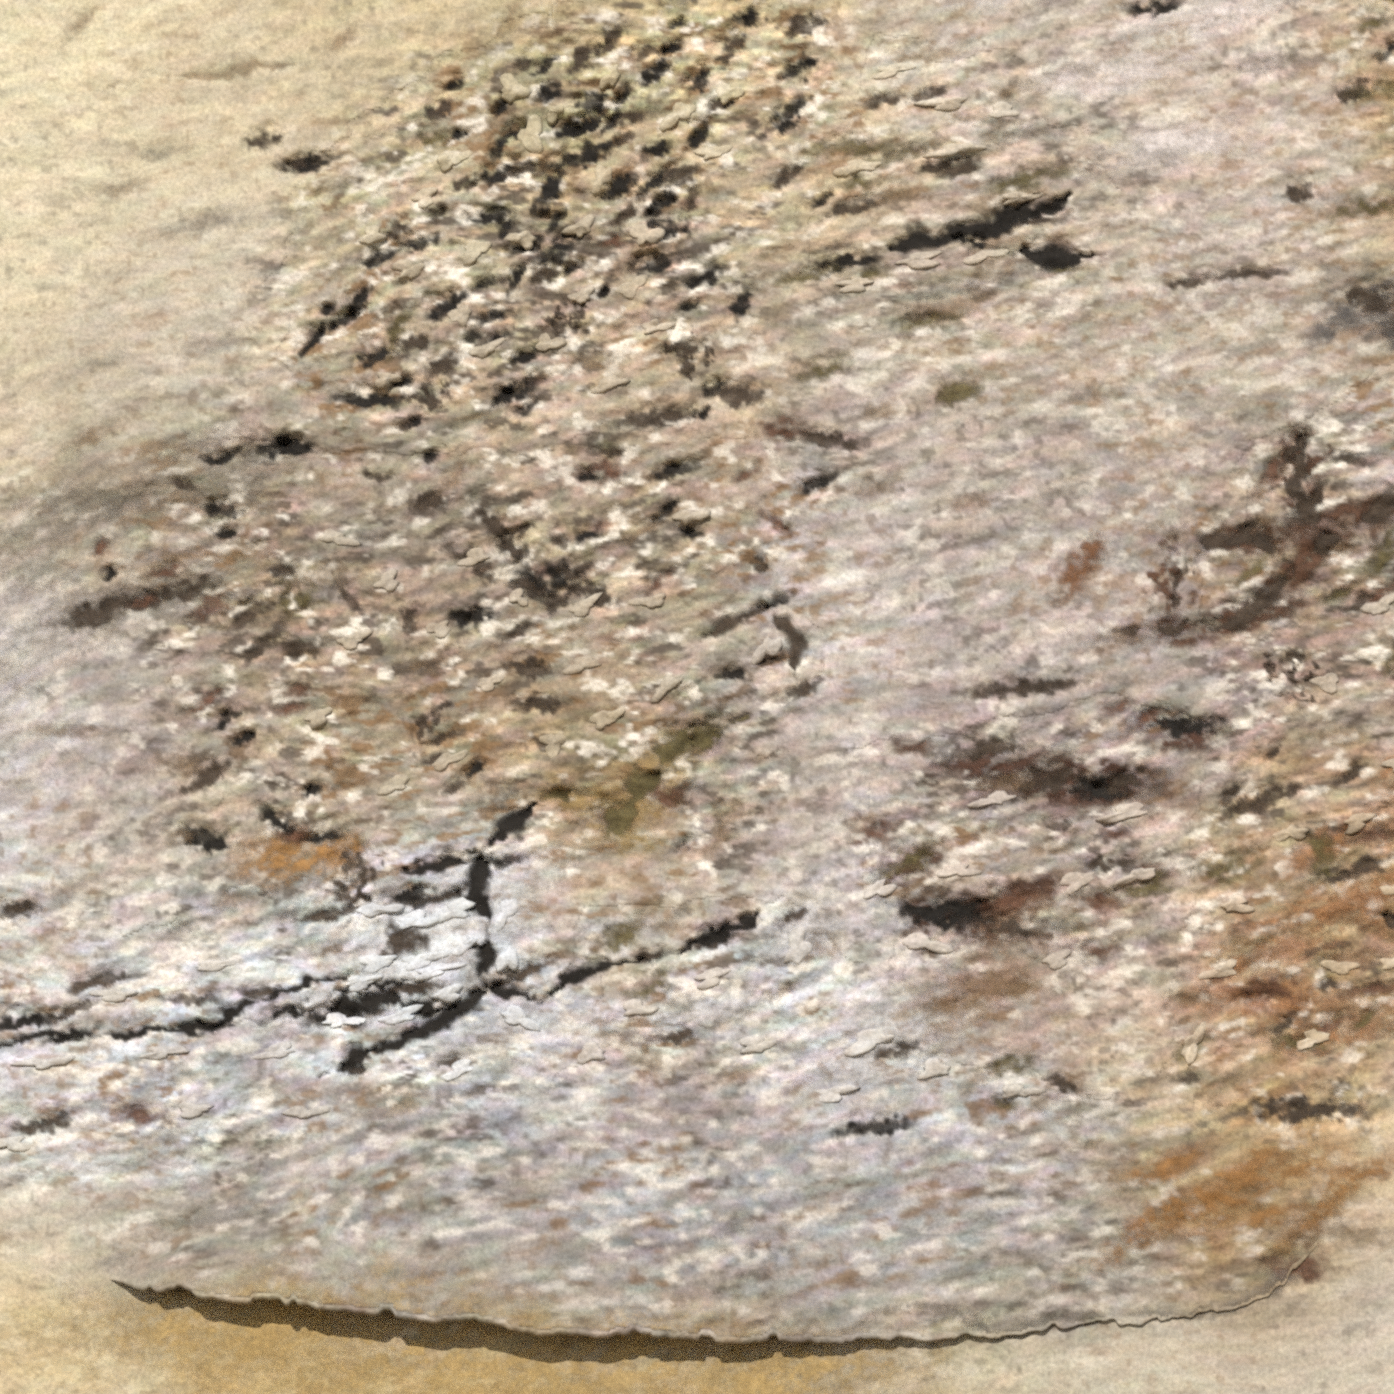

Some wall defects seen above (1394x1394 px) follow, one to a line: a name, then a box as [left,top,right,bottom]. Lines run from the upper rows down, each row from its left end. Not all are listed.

crack [605,715,749,835]
crack [109,790,643,1072]
crack [681,912,758,953]
corrosion [1293,880,1378,932]
corrosion [1233,955,1266,969]
corrosion [1221,980,1311,1014]
crack [0,1029,76,1047]
corrosion [1129,1149,1310,1242]
corrosion [1298,1161,1384,1232]